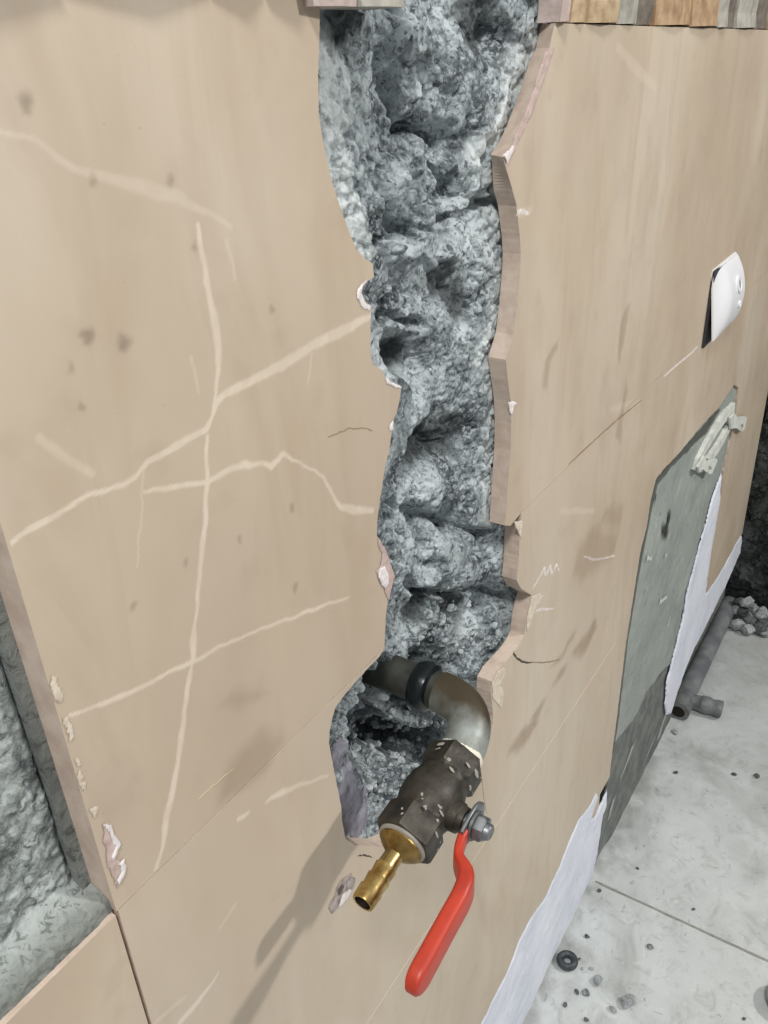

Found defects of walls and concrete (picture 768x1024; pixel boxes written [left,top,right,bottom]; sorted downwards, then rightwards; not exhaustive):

spalling [318,0,554,839]
crack [513,653,560,664]
peeling [0,662,114,1020]
peeling [89,805,127,888]
spalling [329,874,355,914]